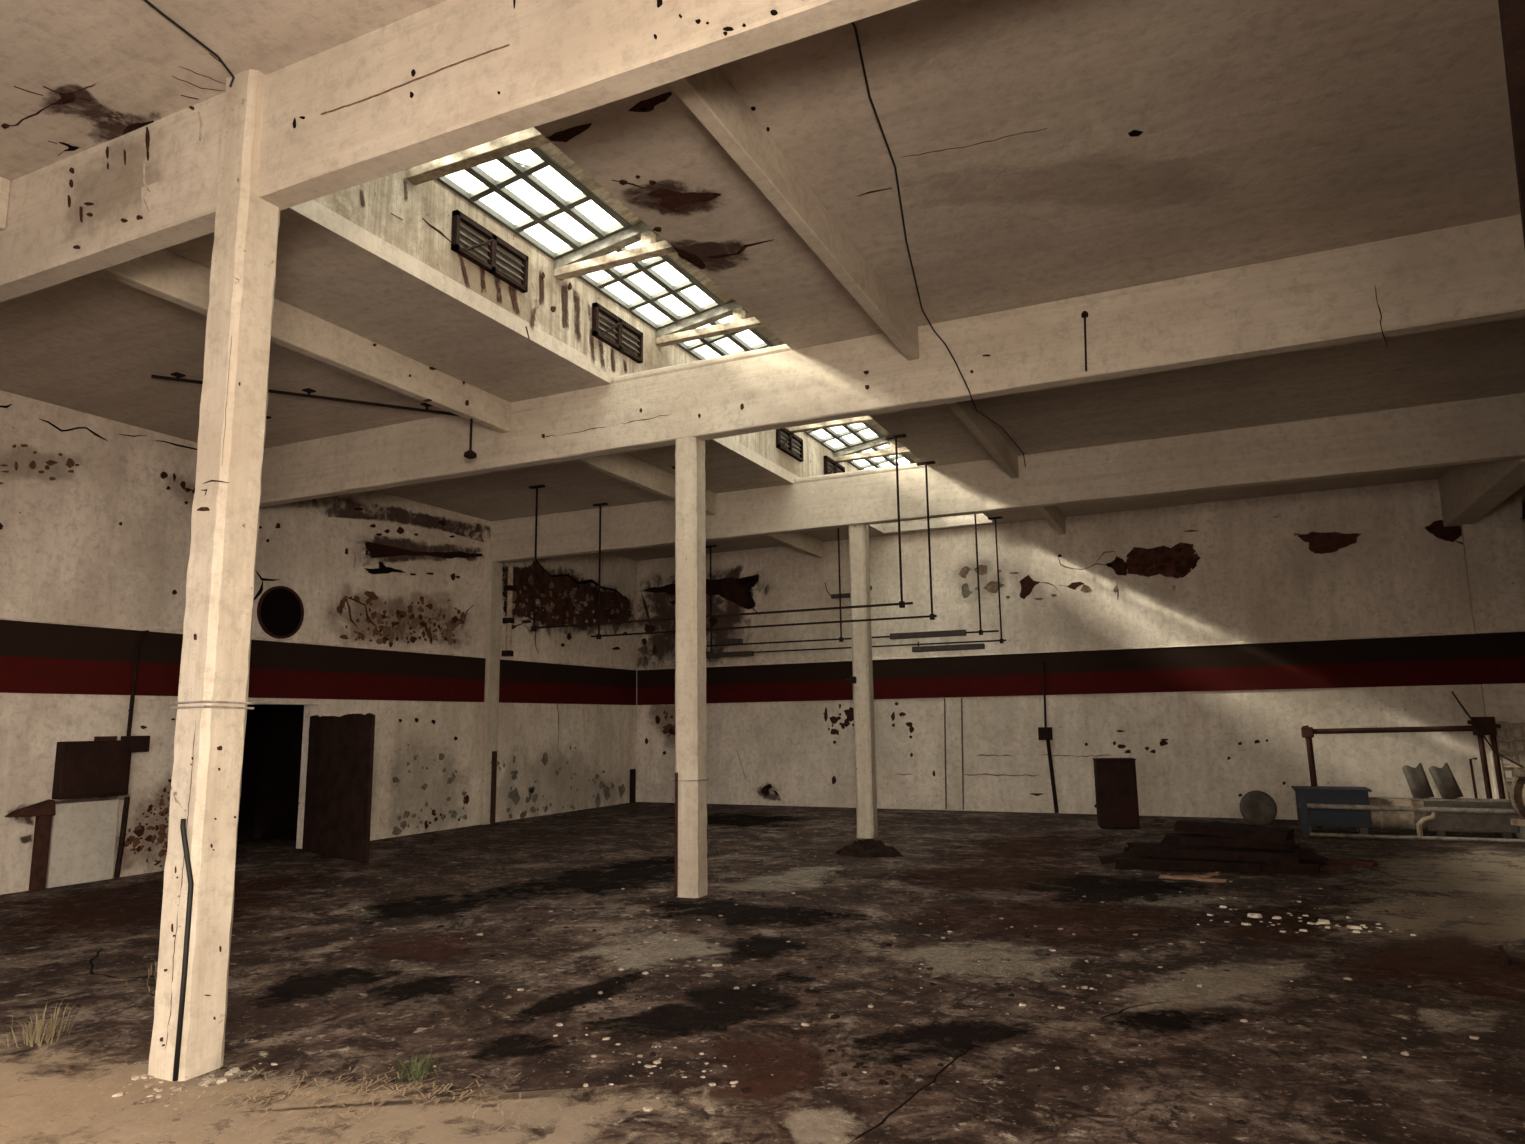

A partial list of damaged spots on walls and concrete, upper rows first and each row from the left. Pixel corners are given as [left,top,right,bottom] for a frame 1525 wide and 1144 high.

peeling [329,536,483,647]
spalling [501,560,676,669]
spalling [706,567,768,663]
spalling [959,530,1200,600]
spalling [1295,532,1361,554]
spalling [1425,520,1463,545]